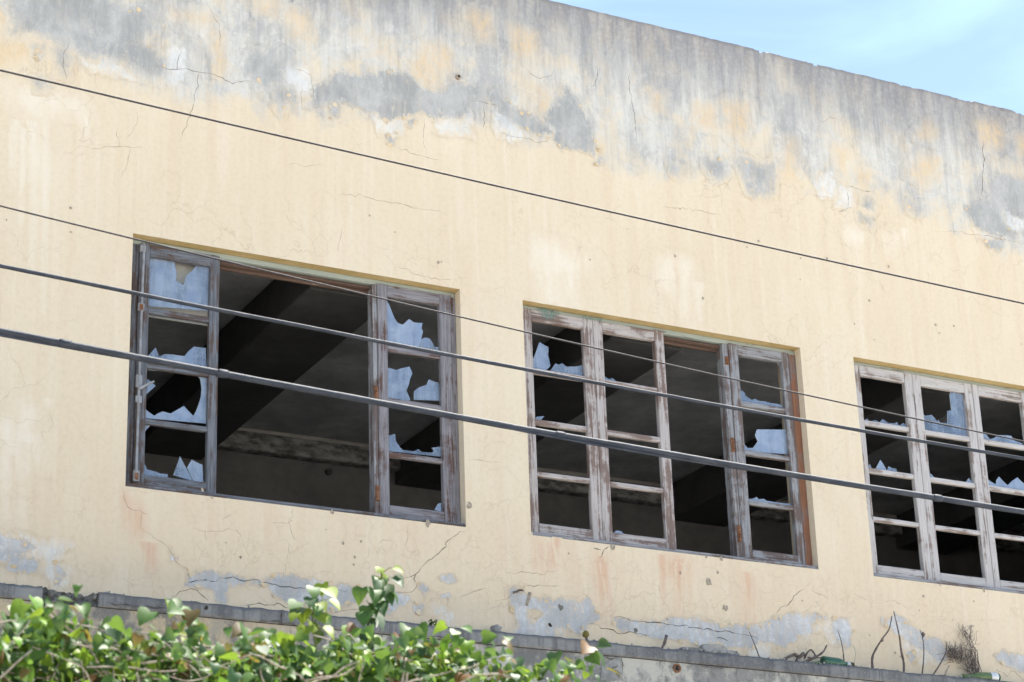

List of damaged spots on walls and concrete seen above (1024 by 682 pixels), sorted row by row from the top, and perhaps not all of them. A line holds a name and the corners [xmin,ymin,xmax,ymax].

leakage [0,0,107,320]
leakage [52,0,234,94]
crack [163,51,245,141]
leakage [248,0,655,128]
peeling [310,67,605,167]
leakage [431,104,532,148]
leakage [668,29,949,193]
peeling [0,533,98,607]
crack [107,577,301,626]
peeling [163,545,366,614]
crack [397,528,467,593]
peeling [508,585,856,654]